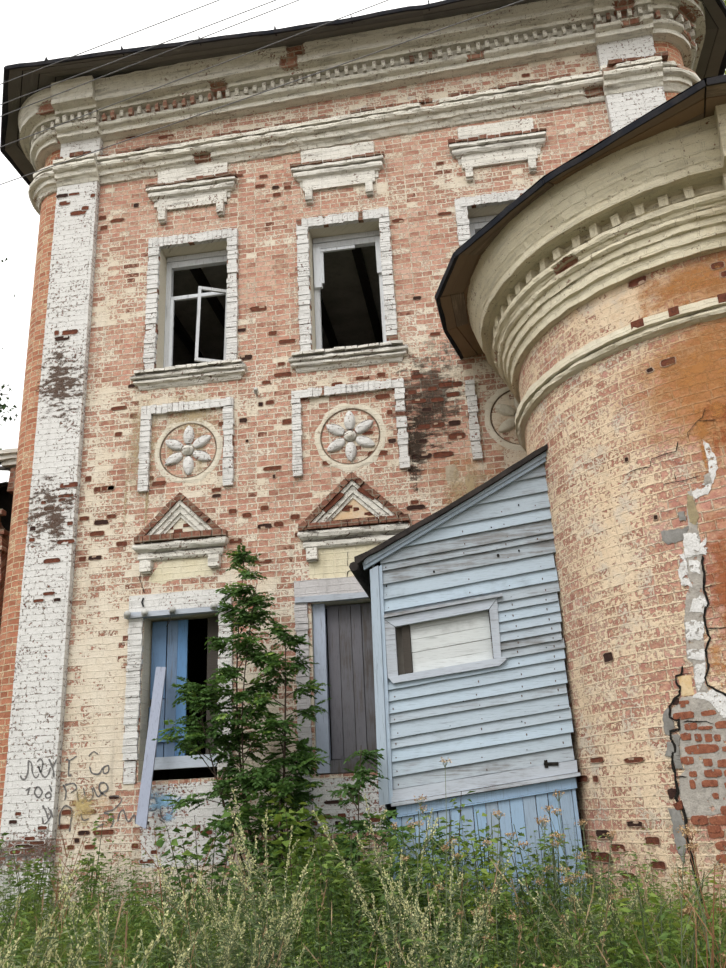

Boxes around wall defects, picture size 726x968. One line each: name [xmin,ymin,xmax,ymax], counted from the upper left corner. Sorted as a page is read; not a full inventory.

leakage [35,345,86,422]
leakage [408,417,421,491]
crack [625,409,710,485]
leakage [24,476,76,549]
flaking render [664,533,726,864]
spalling [623,756,645,764]
spalling [626,820,661,846]